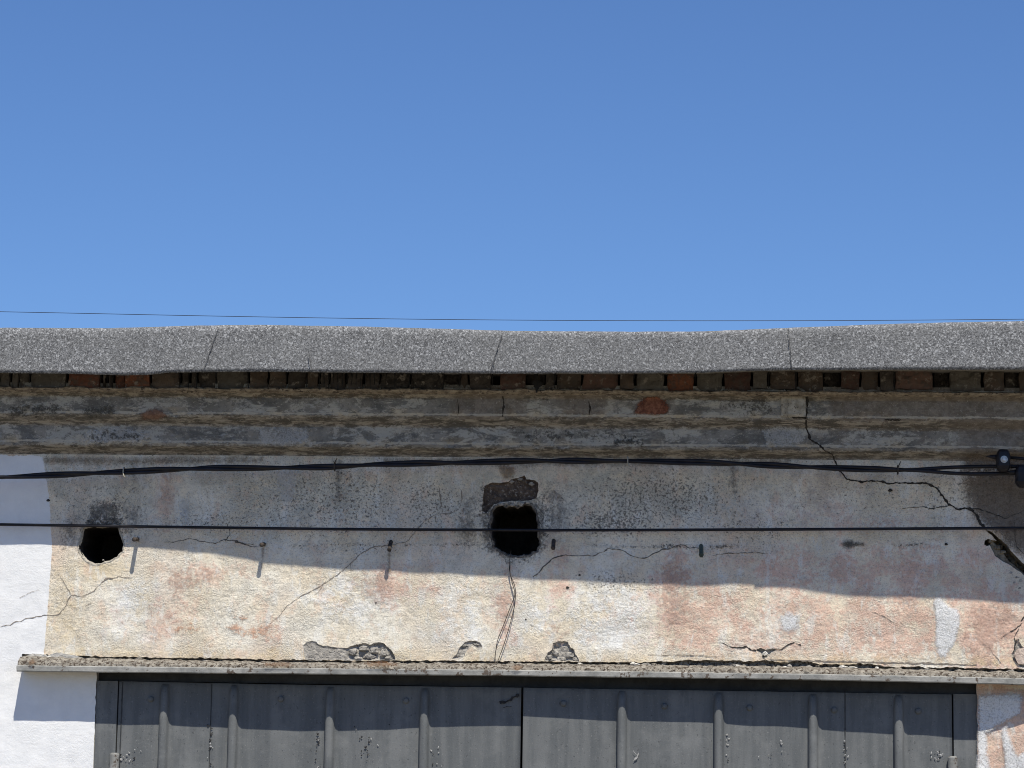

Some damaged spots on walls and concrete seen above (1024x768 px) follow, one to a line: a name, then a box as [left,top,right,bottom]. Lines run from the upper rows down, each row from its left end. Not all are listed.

flaking render [634,397,669,415]
crack [779,376,1024,554]
spalling [482,475,541,558]
hole [77,524,125,566]
crack [270,488,462,624]
crack [533,544,767,577]
crack [1,574,130,627]
spalling [22,597,1024,672]
crack [648,617,1024,665]